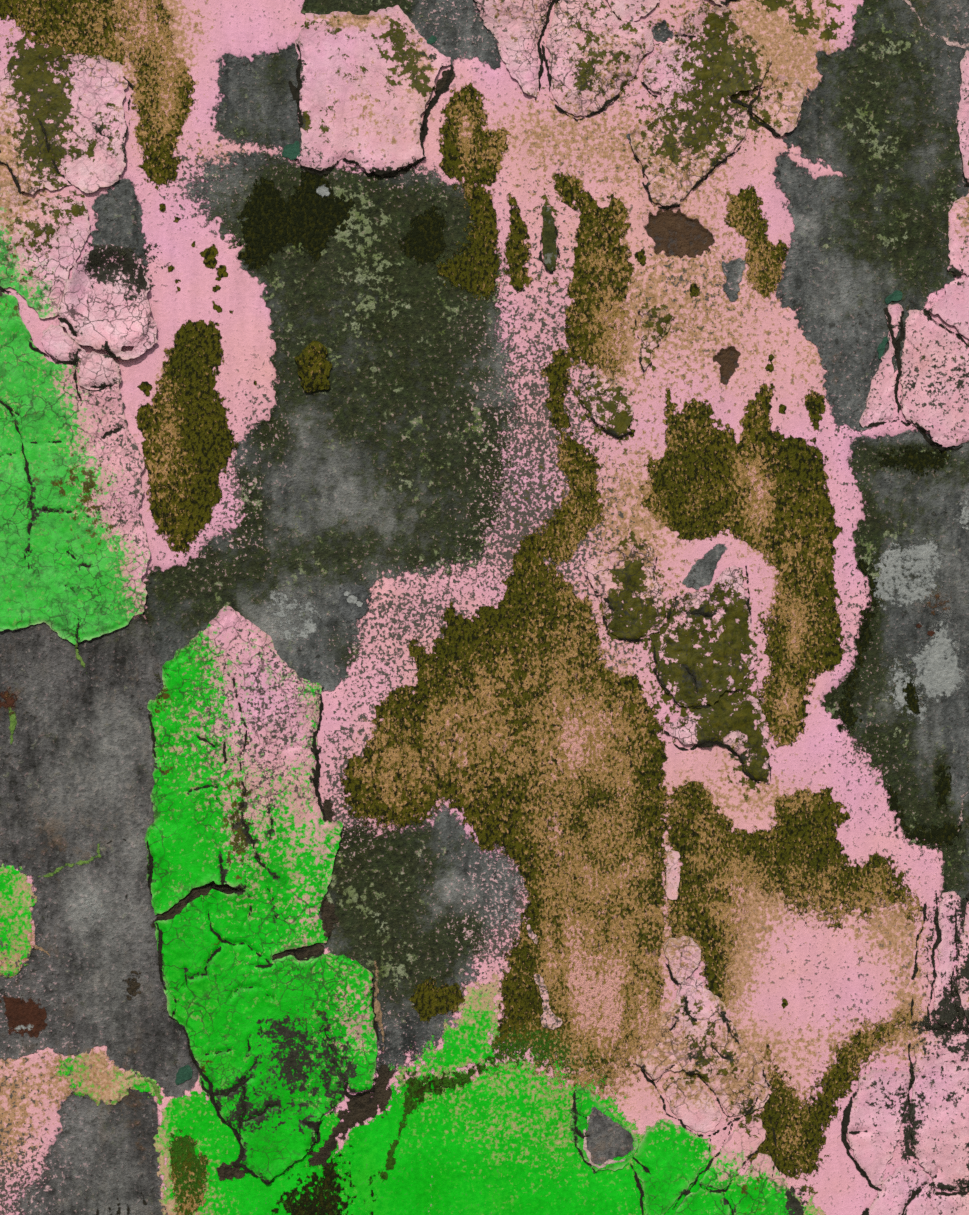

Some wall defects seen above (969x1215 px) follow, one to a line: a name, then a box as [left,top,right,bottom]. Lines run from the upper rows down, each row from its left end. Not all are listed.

crack [535,0,696,122]
peeling [541,205,558,271]
crack [866,307,969,451]
peeling [0,0,550,1182]
peeling [546,0,969,1026]
peeling [0,1087,168,1215]
crack [146,678,379,1185]
peeling [534,974,562,1030]
crack [640,963,777,1215]
crack [841,1089,969,1215]
peeling [847,1033,969,1215]
crack [907,893,969,1106]